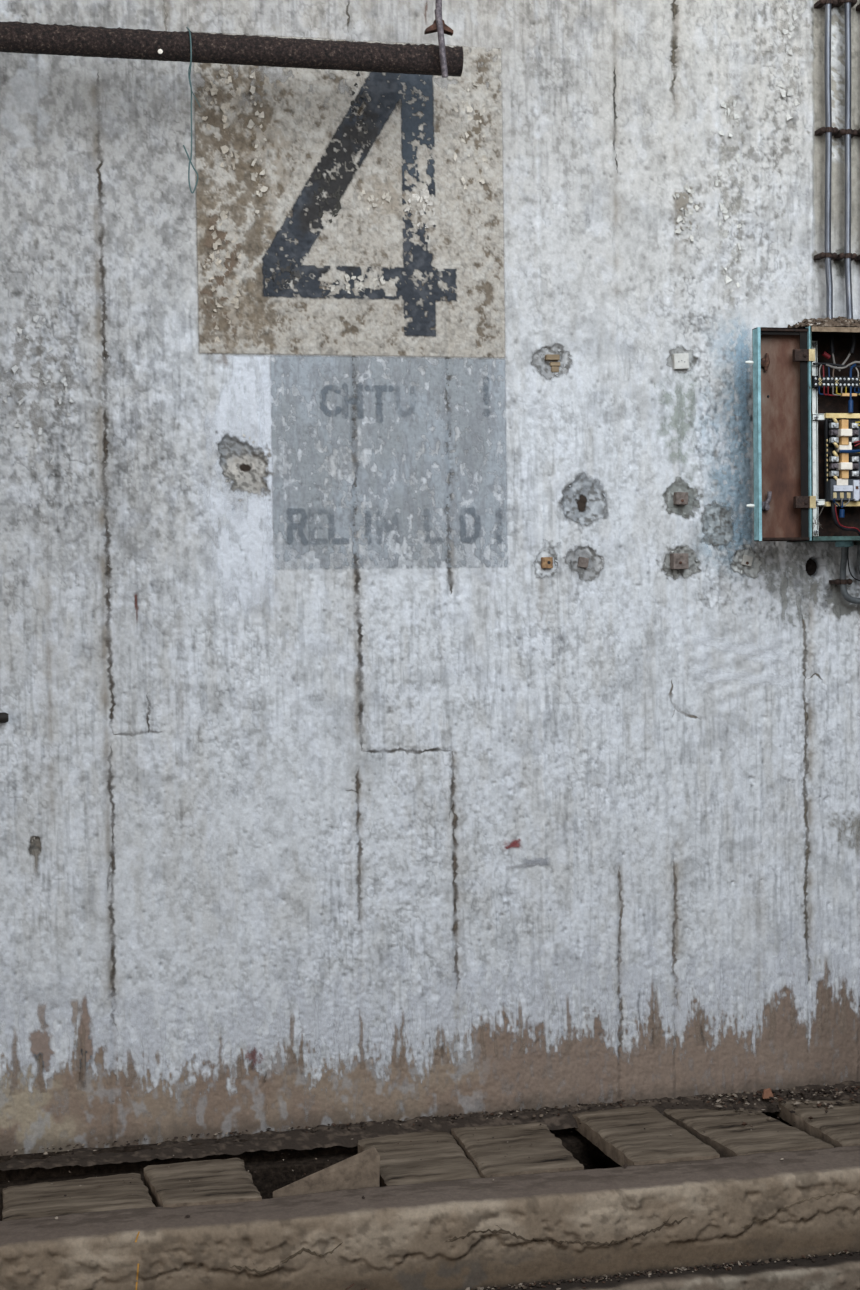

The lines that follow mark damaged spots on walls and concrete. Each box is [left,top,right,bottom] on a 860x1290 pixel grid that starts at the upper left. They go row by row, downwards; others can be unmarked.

crack [670,0,678,91]
spalling [531,343,572,380]
spalling [217,434,273,501]
spalling [558,472,608,526]
spalling [656,477,762,580]
spalling [534,540,605,581]
leakage [0,928,860,1156]
crack [230,1243,342,1275]
crack [446,1216,688,1251]
crack [744,1191,860,1227]